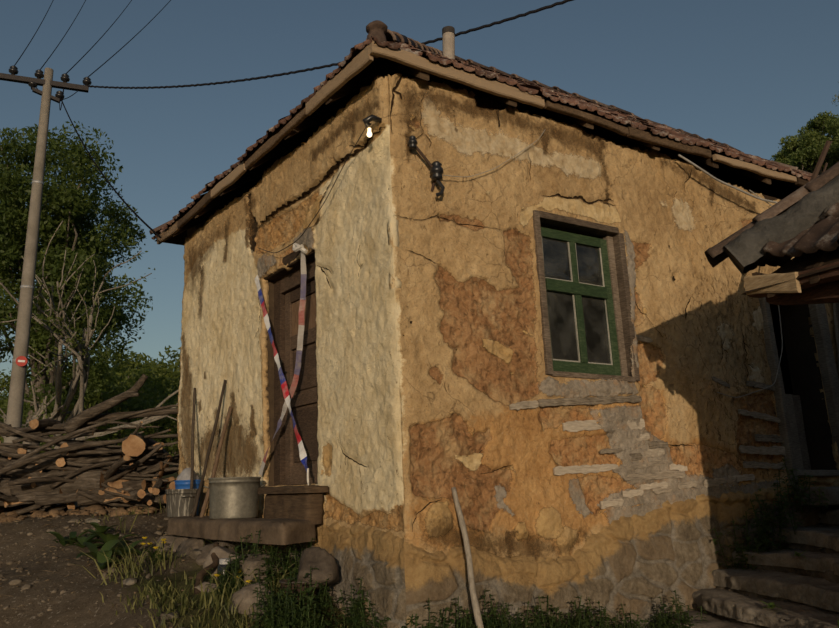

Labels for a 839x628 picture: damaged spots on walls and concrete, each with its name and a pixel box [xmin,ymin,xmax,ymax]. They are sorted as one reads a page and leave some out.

crack [257,76,432,229]
water stain [312,102,378,160]
peeling [408,97,602,182]
water stain [245,196,255,248]
crack [393,215,497,229]
water stain [187,230,228,315]
spalling [435,197,621,406]
spalling [637,343,668,441]
water stain [196,393,264,478]
spalling [409,410,516,532]
spalling [549,434,634,516]
spalling [670,394,783,485]